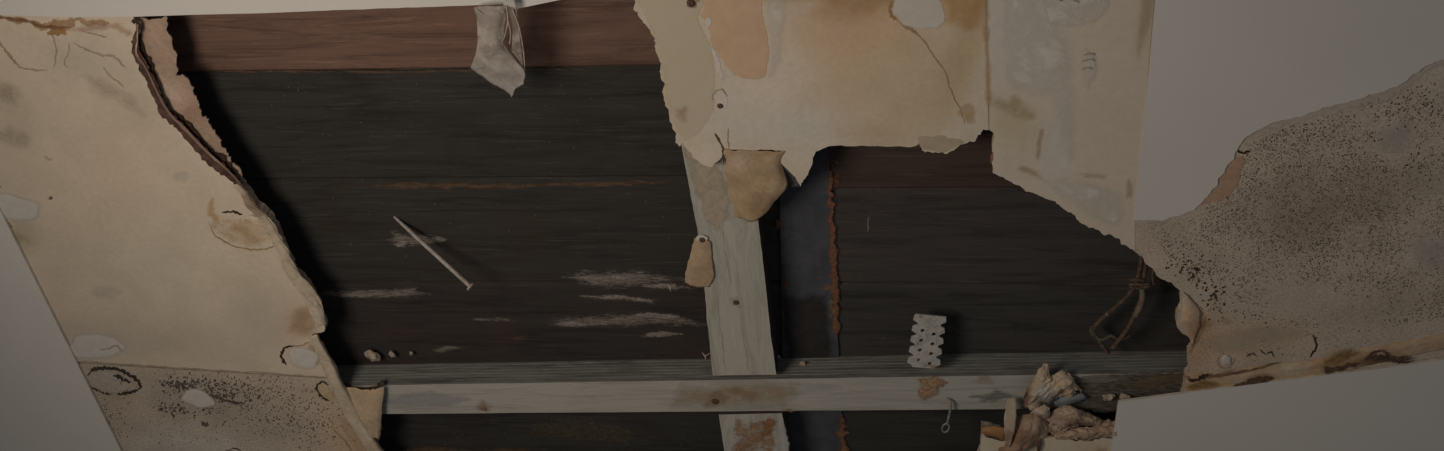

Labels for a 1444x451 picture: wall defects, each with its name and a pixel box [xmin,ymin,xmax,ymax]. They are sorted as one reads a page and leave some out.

peeling [637,0,769,140]
leakage [918,135,963,152]
leakage [209,202,274,251]
leakage [1147,82,1444,361]
leakage [322,287,420,298]
peeling [1177,291,1201,344]
spalling [87,366,142,396]
leakage [96,372,366,451]
leakage [1058,371,1184,412]